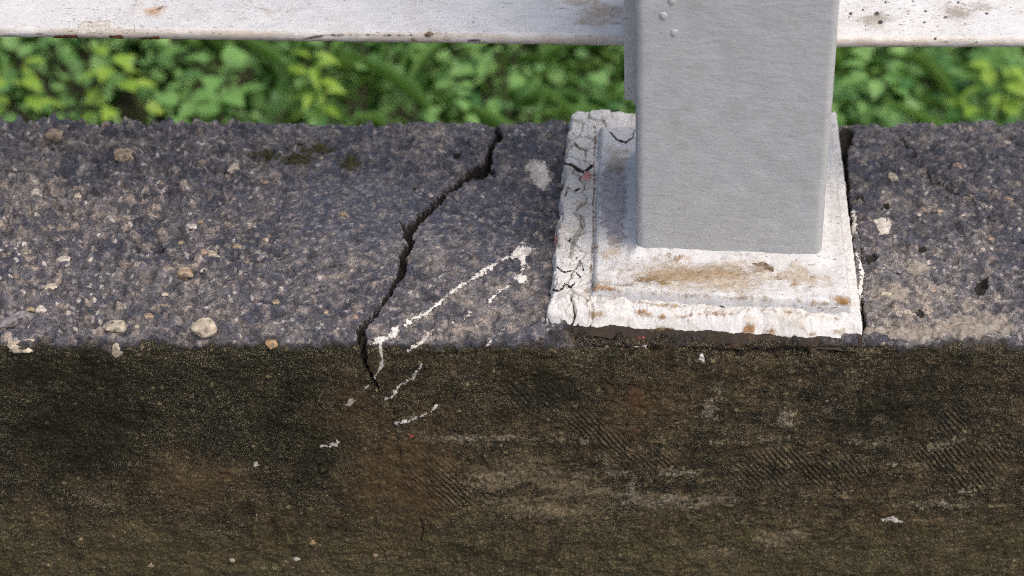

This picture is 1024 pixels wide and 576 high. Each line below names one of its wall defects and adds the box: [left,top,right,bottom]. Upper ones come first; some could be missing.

crack [550,125,635,292]
crack [351,127,503,478]
corrosion [638,255,817,330]
efflorescence [421,429,524,446]